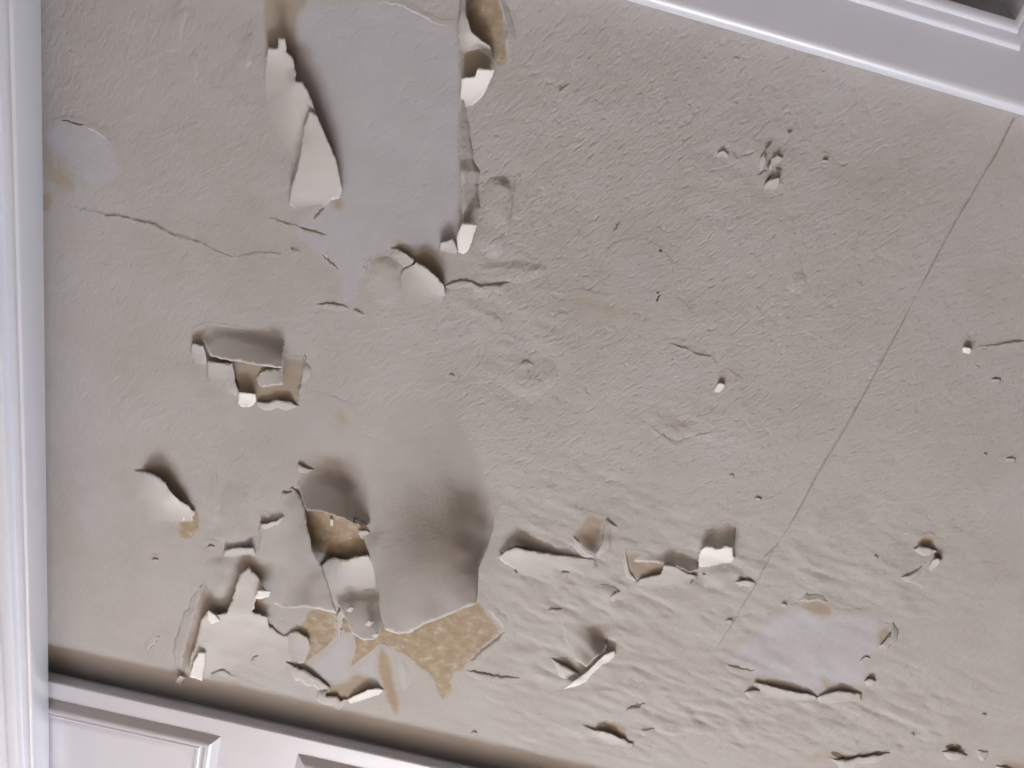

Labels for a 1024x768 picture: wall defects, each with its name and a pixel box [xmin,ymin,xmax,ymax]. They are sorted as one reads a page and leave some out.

peeling [260,0,516,310]
peeling [757,139,783,190]
crack [70,206,365,270]
crack [978,339,1024,350]
crack [715,117,1015,649]
peeling [44,294,617,721]
peeling [622,520,756,590]
peeling [900,533,944,582]
peeling [541,607,655,748]
peeling [724,593,899,704]
peeling [799,742,890,768]